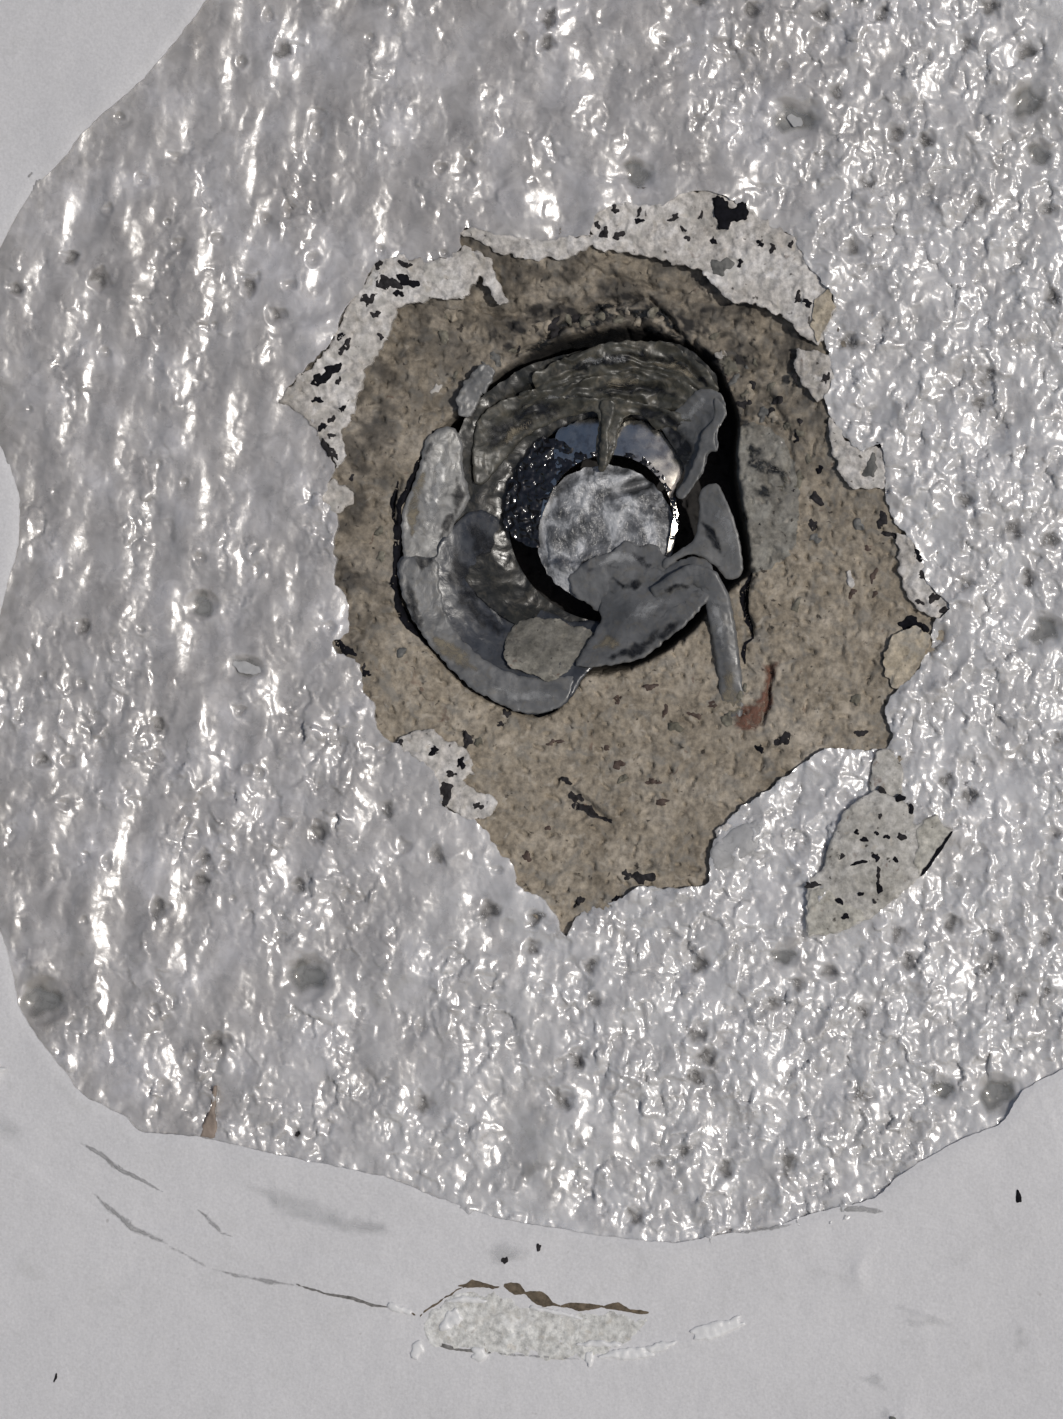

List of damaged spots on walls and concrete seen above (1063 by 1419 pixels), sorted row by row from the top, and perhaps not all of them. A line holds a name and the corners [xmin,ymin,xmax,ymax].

spalling [278,191,953,938]
corrosion [736,664,776,730]
crack [86,1146,162,1241]
crack [232,1274,649,1317]
peeling [387,1291,745,1367]